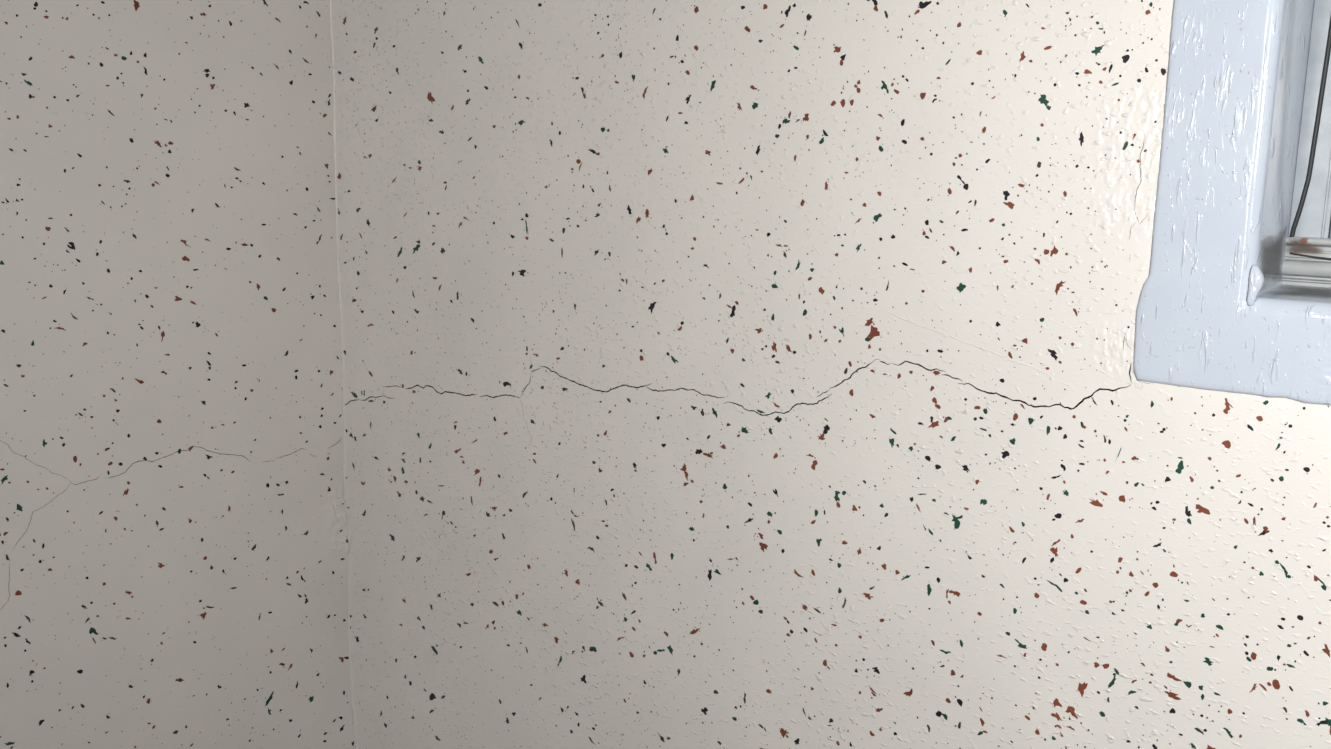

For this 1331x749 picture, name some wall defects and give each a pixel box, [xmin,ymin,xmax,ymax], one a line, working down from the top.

crack [345,336,1131,447]
crack [1,439,341,608]